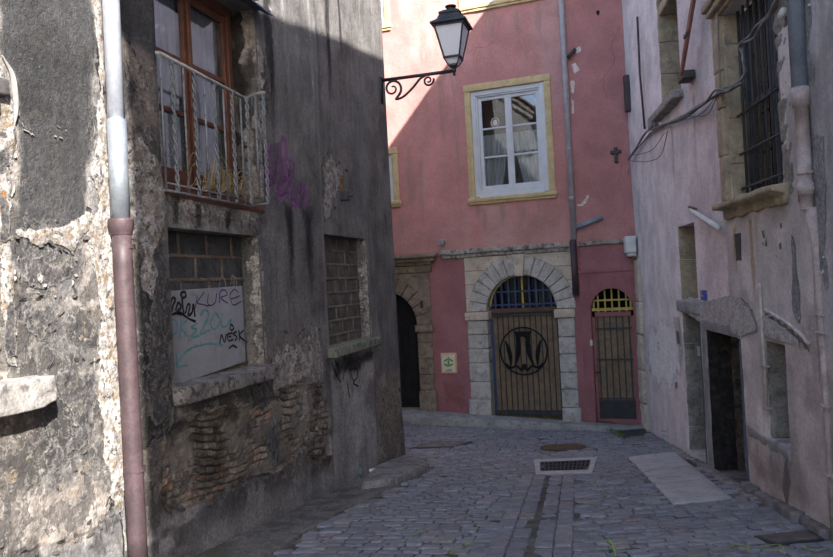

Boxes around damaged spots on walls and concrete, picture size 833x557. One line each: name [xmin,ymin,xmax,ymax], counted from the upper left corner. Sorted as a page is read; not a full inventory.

flaking render [123,39,158,97]
flaking render [0,0,125,555]
flaking render [127,137,261,303]
flaking render [321,152,348,222]
flaking render [159,235,333,514]